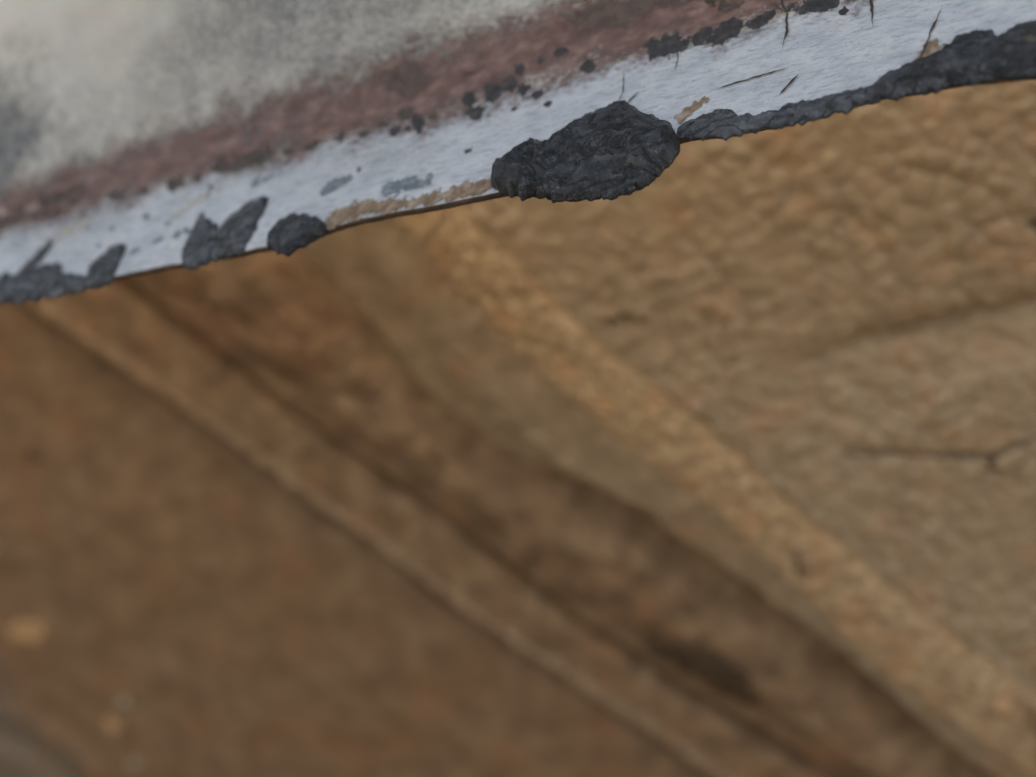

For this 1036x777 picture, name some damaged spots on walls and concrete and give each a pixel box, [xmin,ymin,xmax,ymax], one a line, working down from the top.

damp [358,59,439,137]
damp [461,63,552,120]
damp [579,58,596,73]
rust [674,96,710,124]
rust [914,38,947,61]
damp [166,140,321,192]
peeling [152,175,328,271]
rust [324,178,492,230]
peeling [0,239,140,305]
crack [847,438,1036,471]